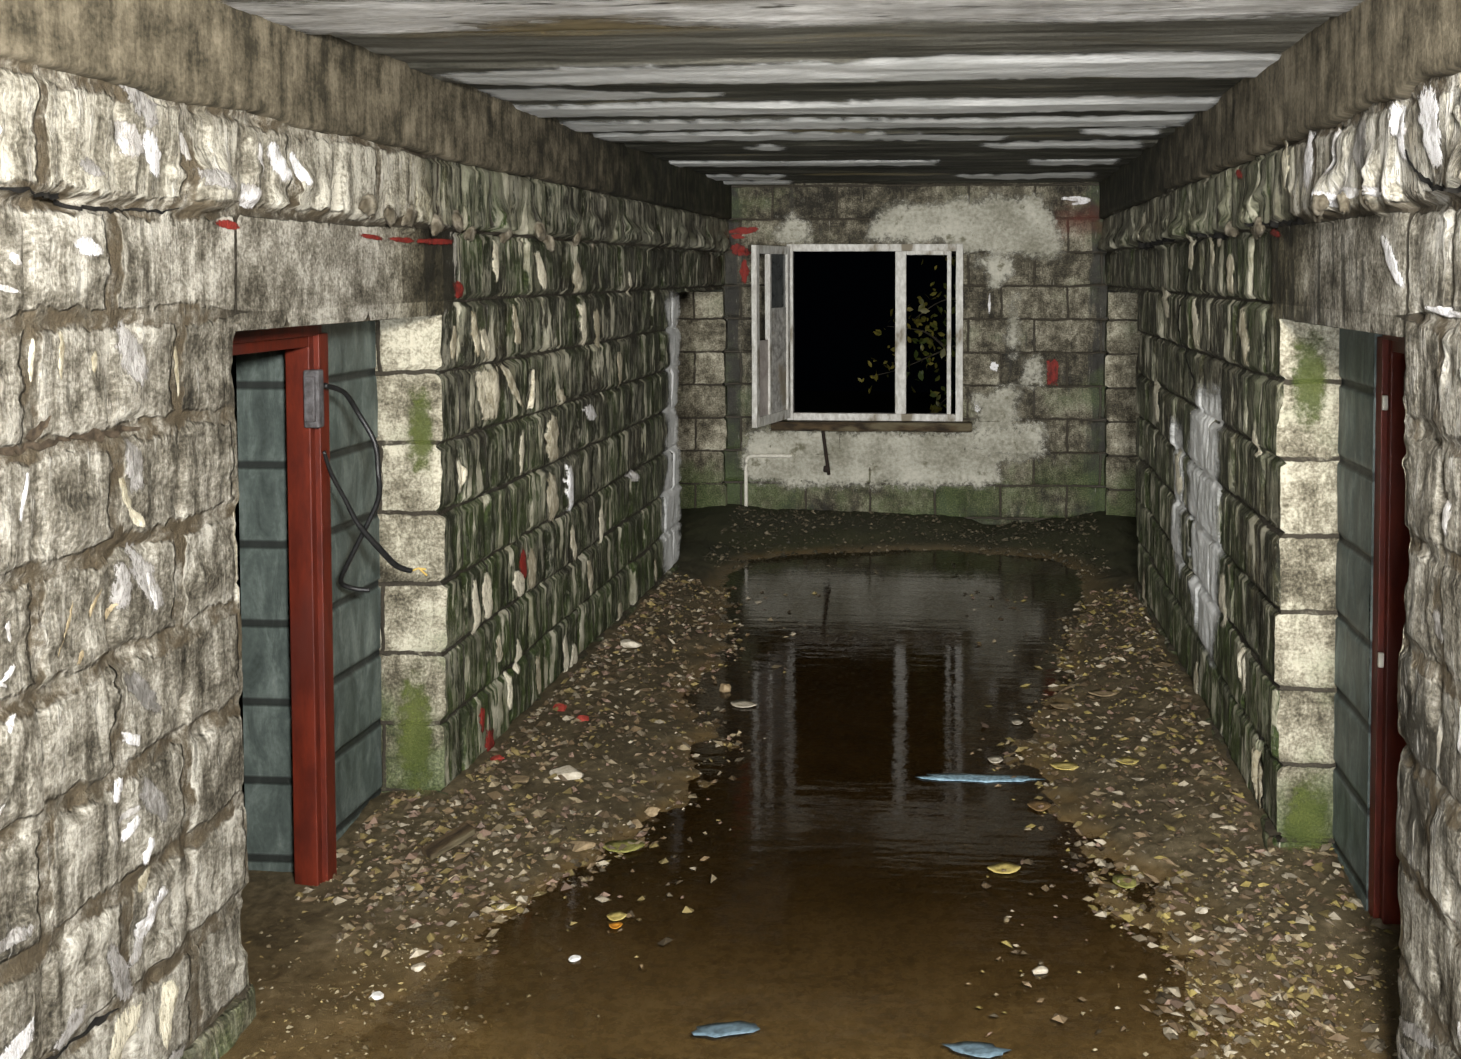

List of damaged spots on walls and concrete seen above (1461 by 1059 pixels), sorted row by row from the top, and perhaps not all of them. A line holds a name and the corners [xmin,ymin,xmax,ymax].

flaking render [729,227,758,284]
flaking render [1046,358,1059,386]